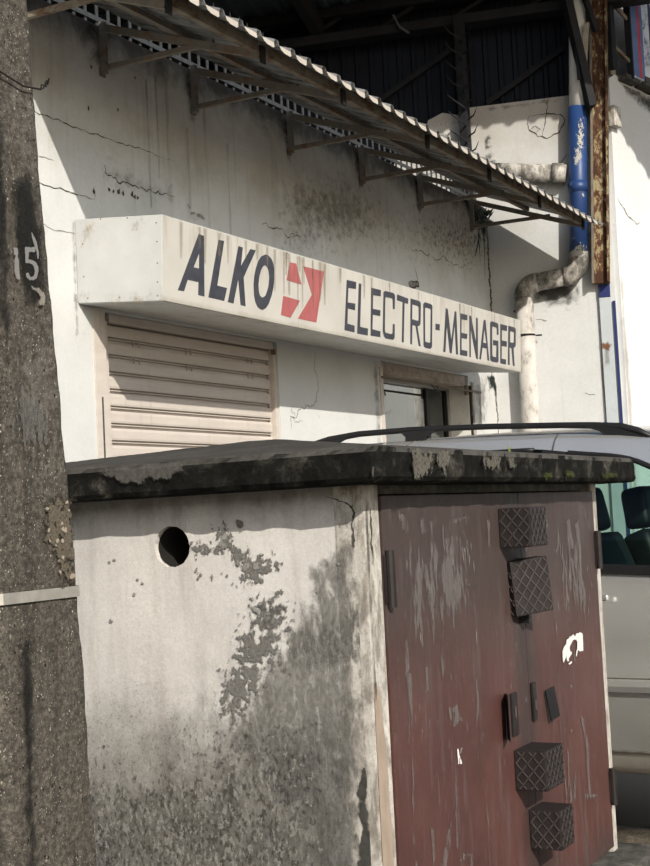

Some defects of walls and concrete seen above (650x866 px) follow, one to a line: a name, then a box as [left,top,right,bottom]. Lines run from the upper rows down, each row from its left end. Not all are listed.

crack [35,111,159,157]
crack [527,99,565,139]
crack [41,163,175,199]
spalling [43,494,76,588]